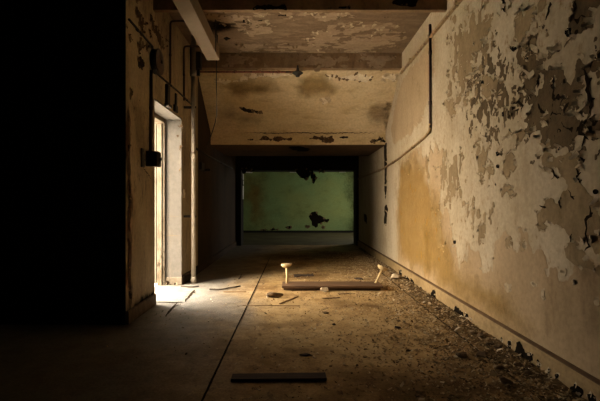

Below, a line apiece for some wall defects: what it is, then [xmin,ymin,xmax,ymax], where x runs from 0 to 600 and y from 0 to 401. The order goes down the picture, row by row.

water stain [300,79,333,97]
peeling [204,3,435,226]
spalling [305,211,329,229]
water stain [399,162,466,290]
peeling [396,0,600,380]